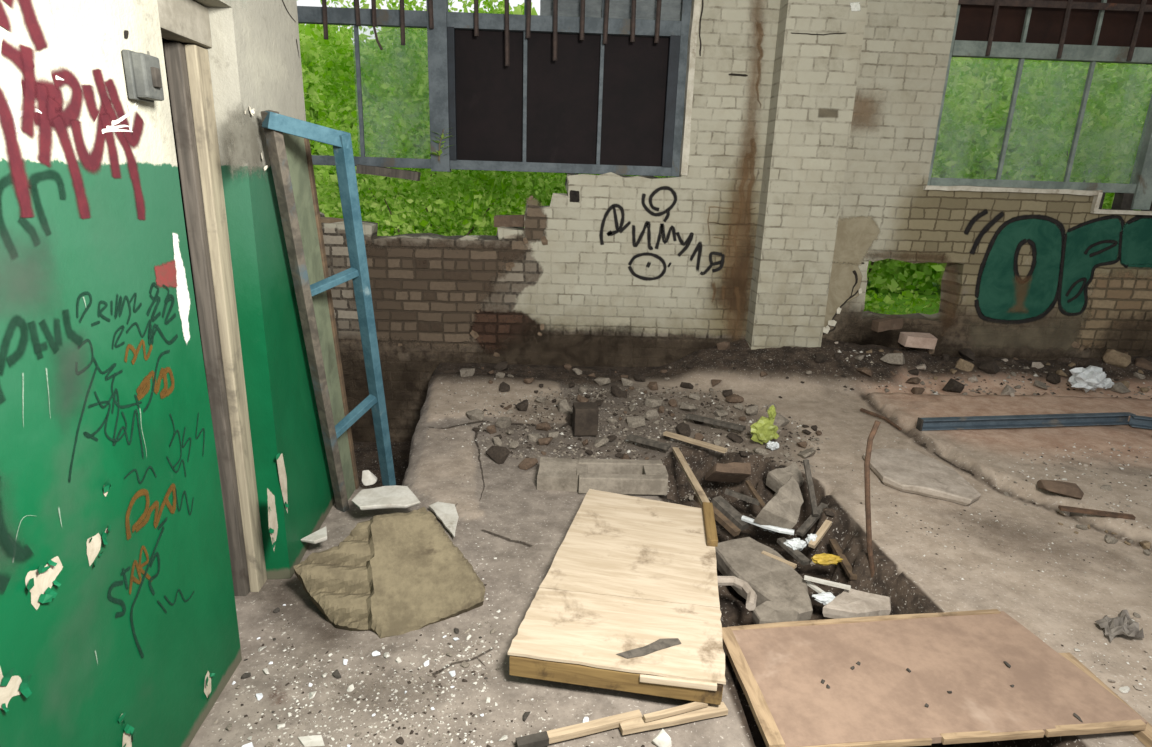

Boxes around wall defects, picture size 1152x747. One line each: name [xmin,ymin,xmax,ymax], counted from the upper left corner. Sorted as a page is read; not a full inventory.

rust [725,3,763,285]
spalling [364,196,548,357]
flaking render [823,262,864,335]
peeling [267,453,289,550]
peeling [87,525,111,567]
peeling [25,556,63,610]
peeling [0,667,32,712]
peeling [118,712,137,747]